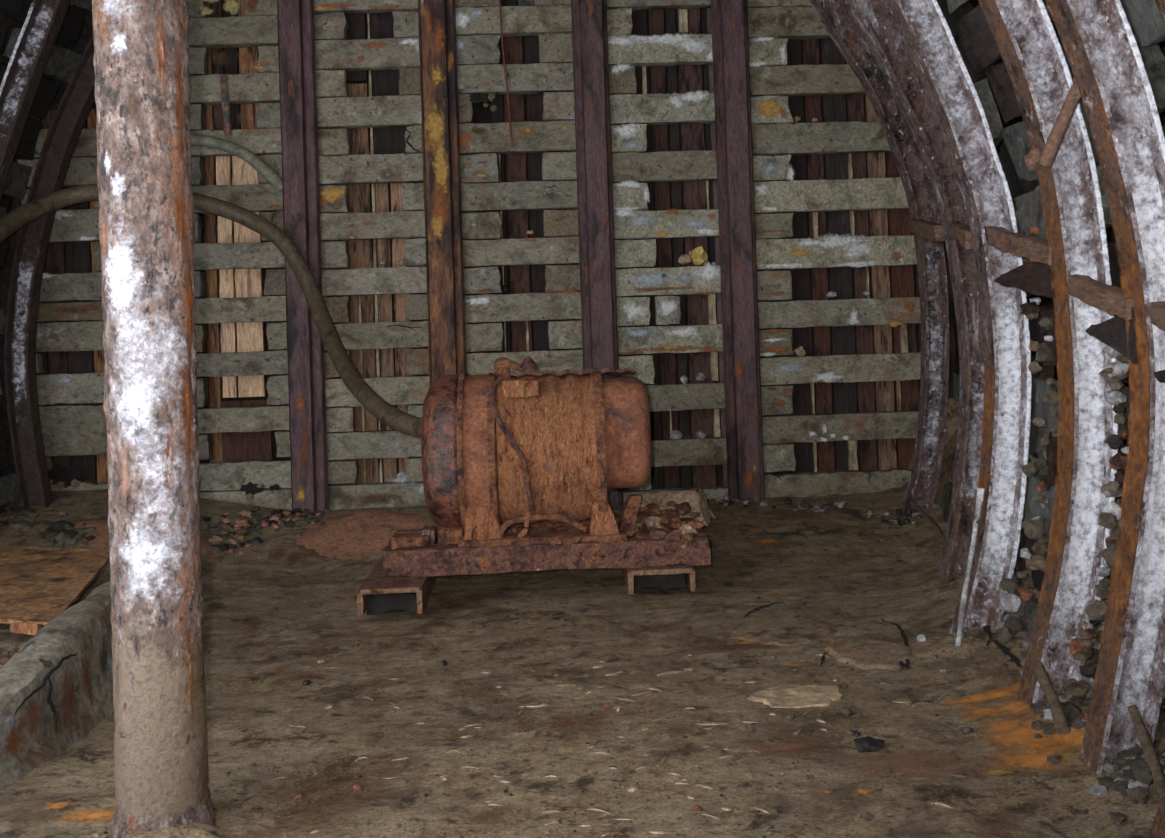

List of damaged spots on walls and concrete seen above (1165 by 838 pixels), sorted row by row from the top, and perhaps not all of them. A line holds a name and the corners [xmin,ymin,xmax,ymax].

damp [3,6,52,114]
damp [12,268,54,402]
damp [905,0,1002,228]
damp [981,277,1021,585]
damp [1000,0,1098,280]
corrosion [1046,316,1074,560]
damp [1053,297,1105,638]
corrosion [1110,259,1149,611]
damp [1119,141,1165,302]
damp [1120,324,1165,716]
corrosion [4,705,38,756]
crack [14,653,77,731]